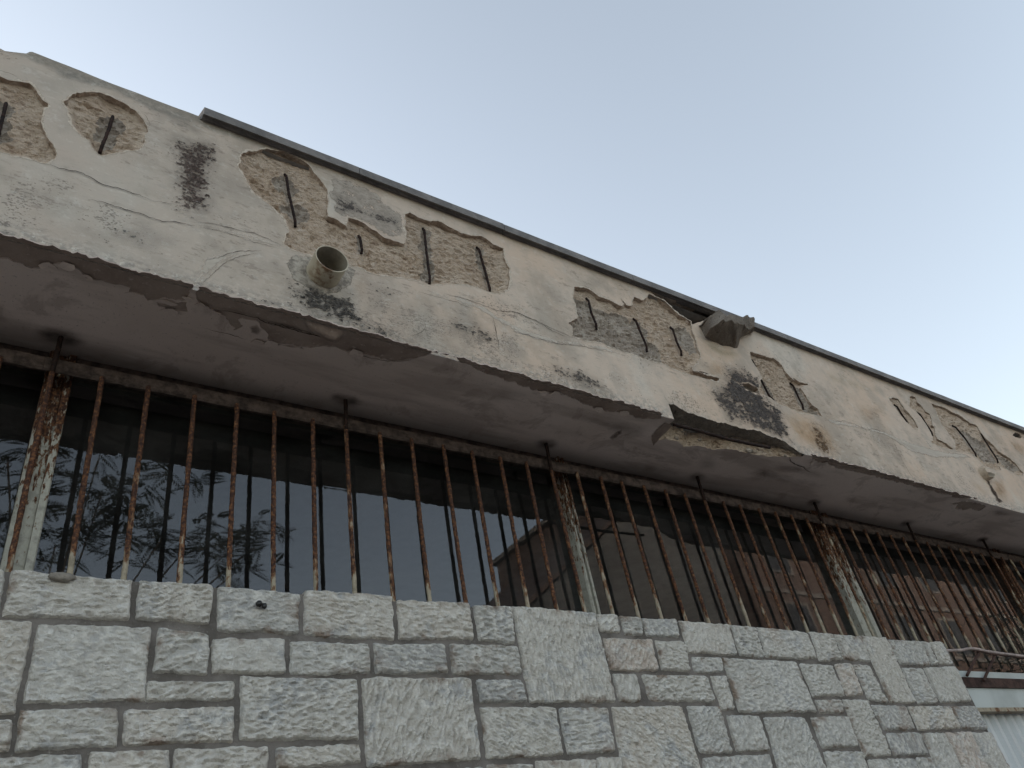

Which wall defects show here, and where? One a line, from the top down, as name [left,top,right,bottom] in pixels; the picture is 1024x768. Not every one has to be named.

spalling [0,76,148,164]
water stain [170,140,216,218]
spalling [237,147,512,294]
water stain [287,278,387,337]
peeling [0,232,986,511]
water stain [713,364,793,443]
spalling [889,396,1024,476]